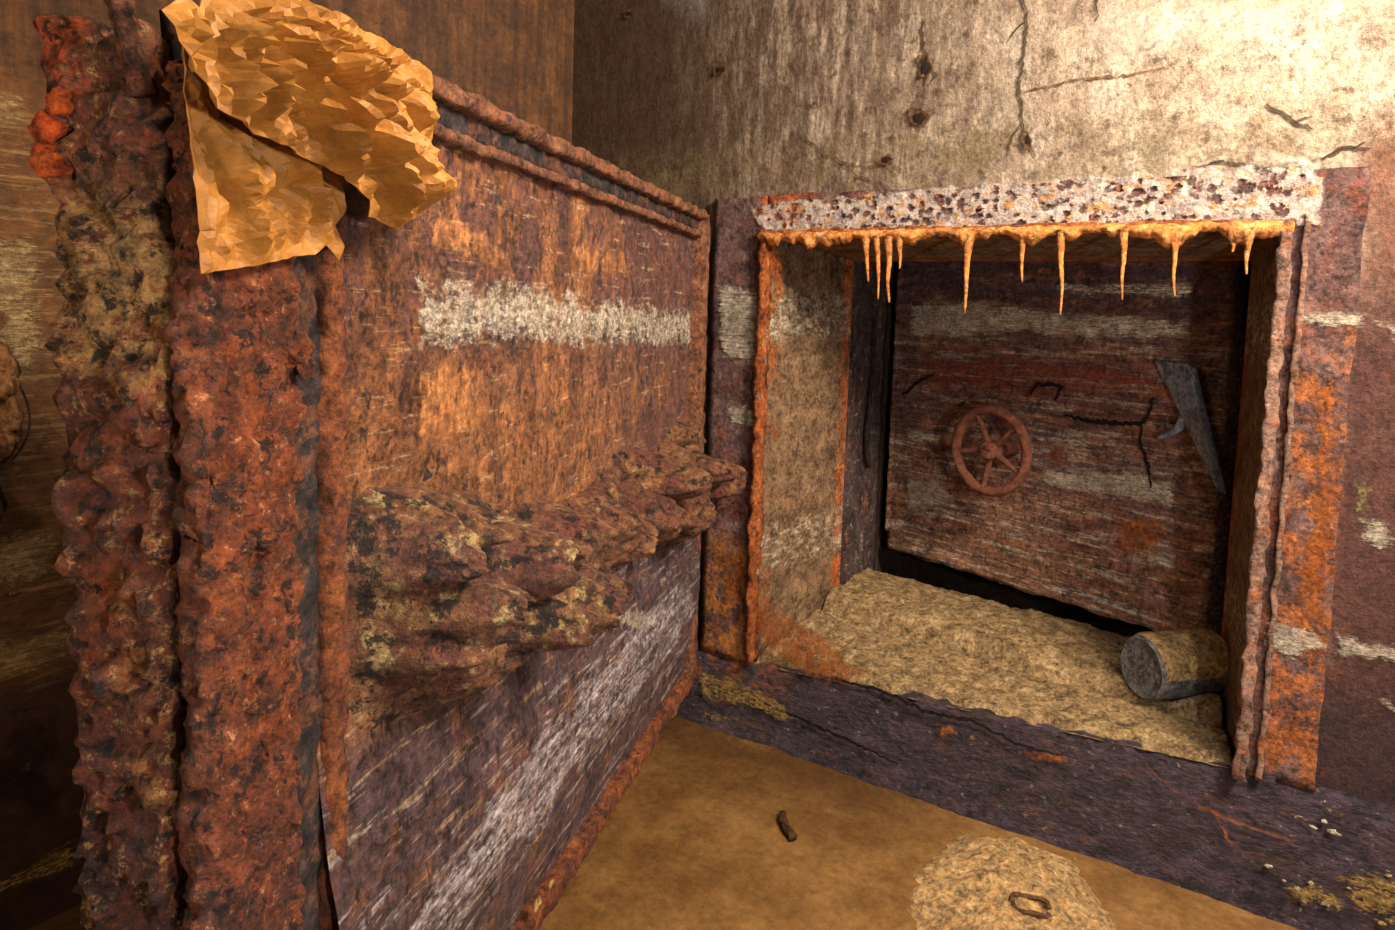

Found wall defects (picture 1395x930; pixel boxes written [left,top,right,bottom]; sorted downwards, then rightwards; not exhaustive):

crack [1008,0,1169,157]
rust [434,221,504,265]
damp [415,273,691,350]
rust [757,219,1295,324]
rust [420,365,482,436]
crack [902,375,933,395]
crack [1030,382,1154,487]
rust [1297,377,1347,659]